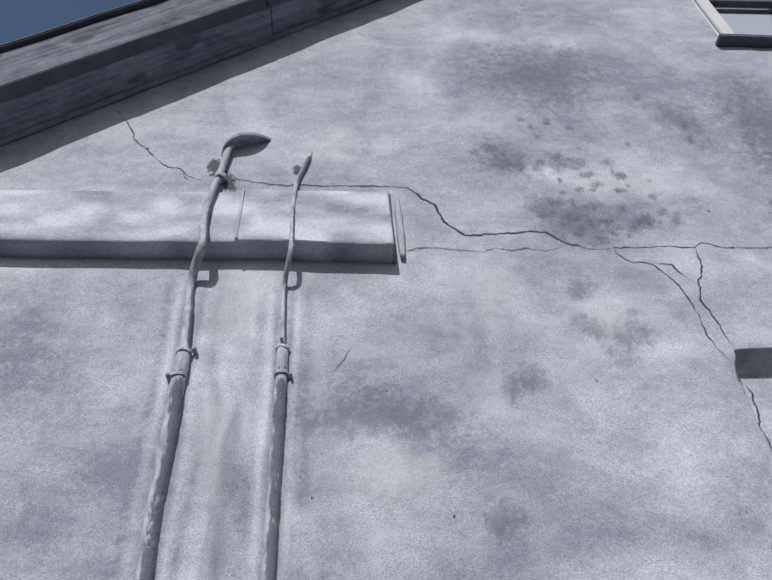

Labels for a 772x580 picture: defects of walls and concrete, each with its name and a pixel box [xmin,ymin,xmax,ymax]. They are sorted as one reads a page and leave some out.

crack [118,111,200,180]
crack [232,175,772,451]